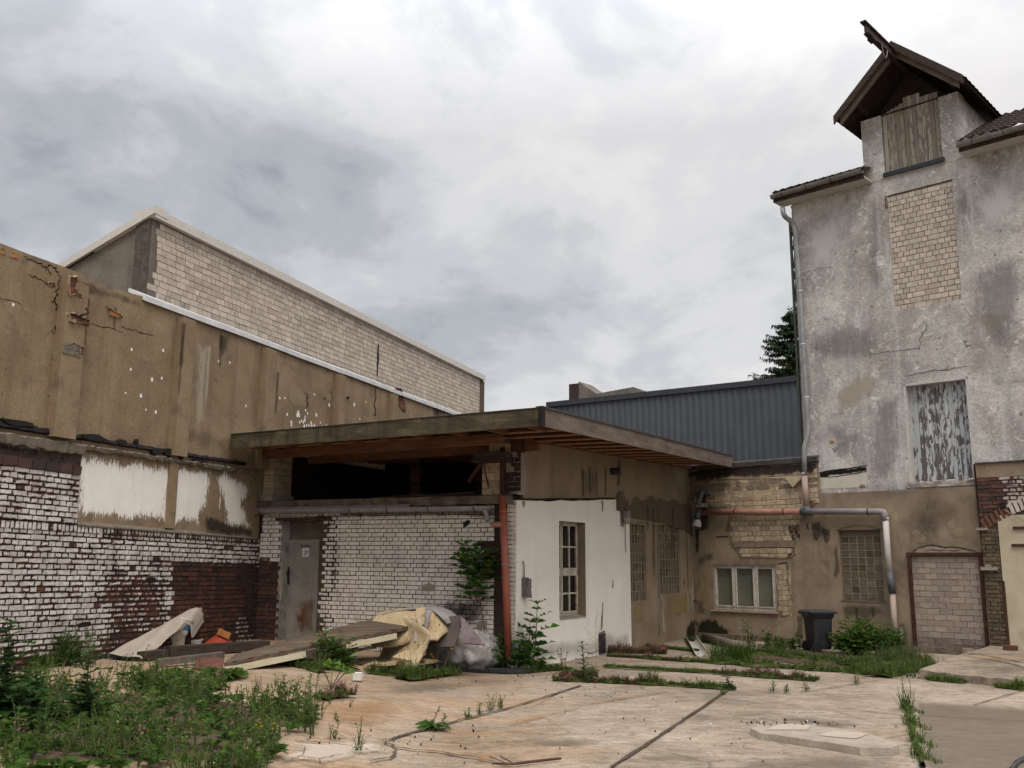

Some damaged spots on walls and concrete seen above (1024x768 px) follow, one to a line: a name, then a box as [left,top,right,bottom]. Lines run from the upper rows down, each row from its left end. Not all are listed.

crack [25,256,62,359]
spalling [67,312,92,327]
water stain [197,338,225,420]
crack [372,343,380,418]
crack [876,324,971,375]
peeling [77,454,250,527]
spalling [693,469,867,617]